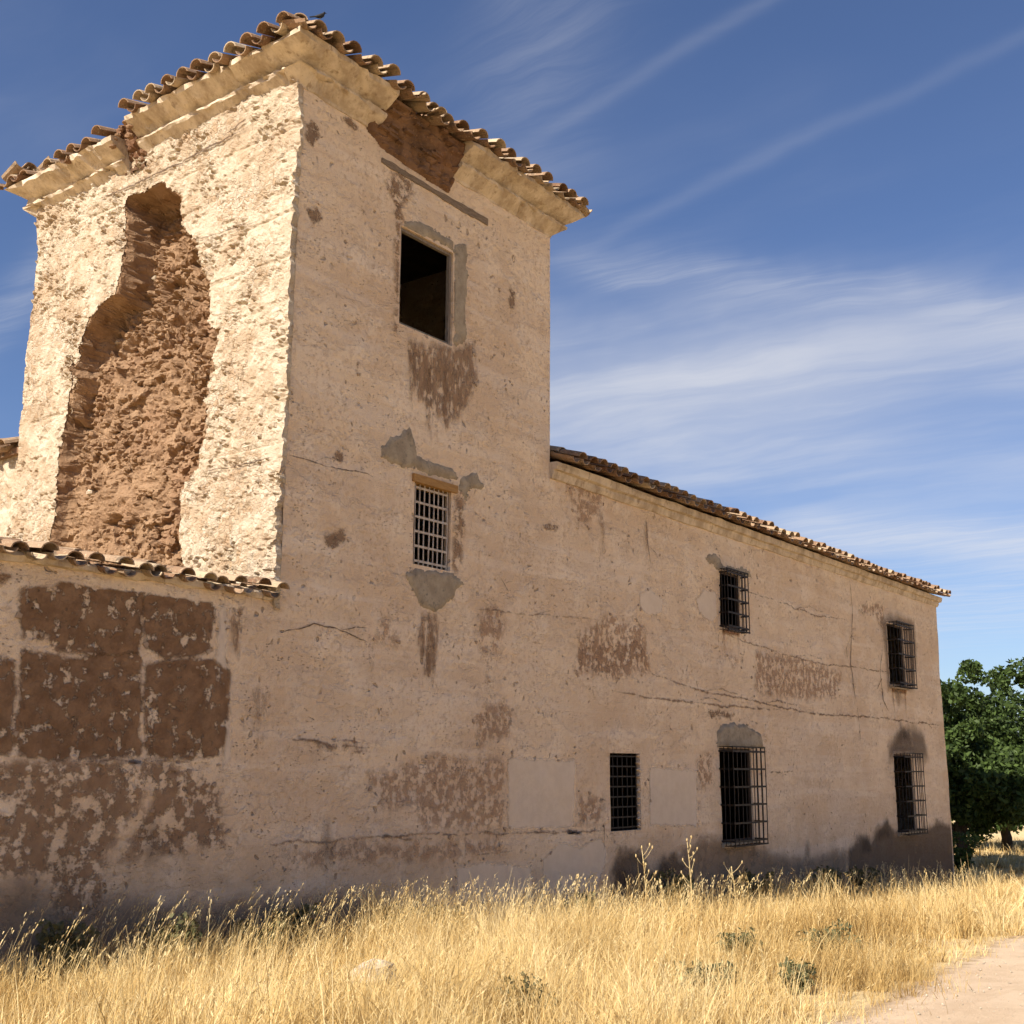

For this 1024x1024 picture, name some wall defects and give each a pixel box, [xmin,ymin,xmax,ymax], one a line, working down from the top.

spalling [345,99,465,293]
spalling [49,181,221,573]
crack [282,623,365,640]
peeling [575,588,664,680]
crack [629,588,936,727]
peeling [727,650,840,697]
flaking render [0,582,231,919]
peeling [365,755,511,860]